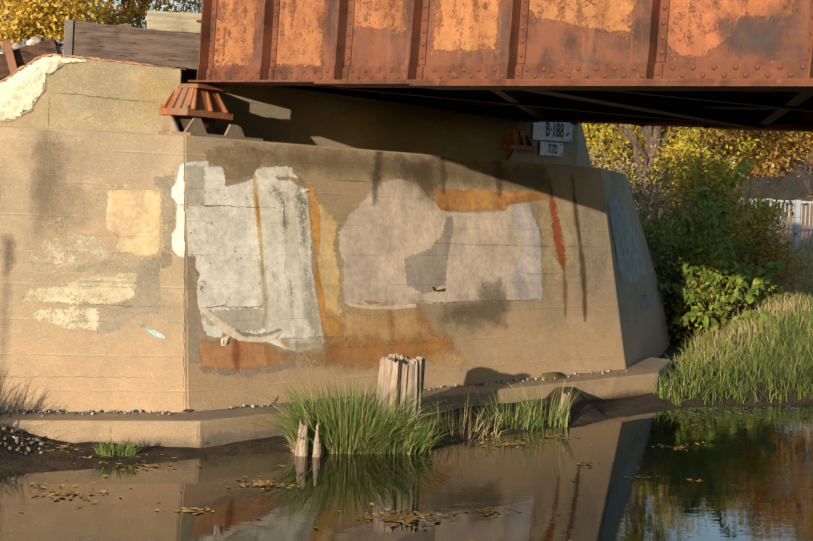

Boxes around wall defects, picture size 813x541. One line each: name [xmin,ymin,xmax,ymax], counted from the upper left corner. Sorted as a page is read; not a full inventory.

spalling [0,53,186,122]
peeling [20,145,325,363]
rust [198,175,470,378]
rust [433,179,566,271]